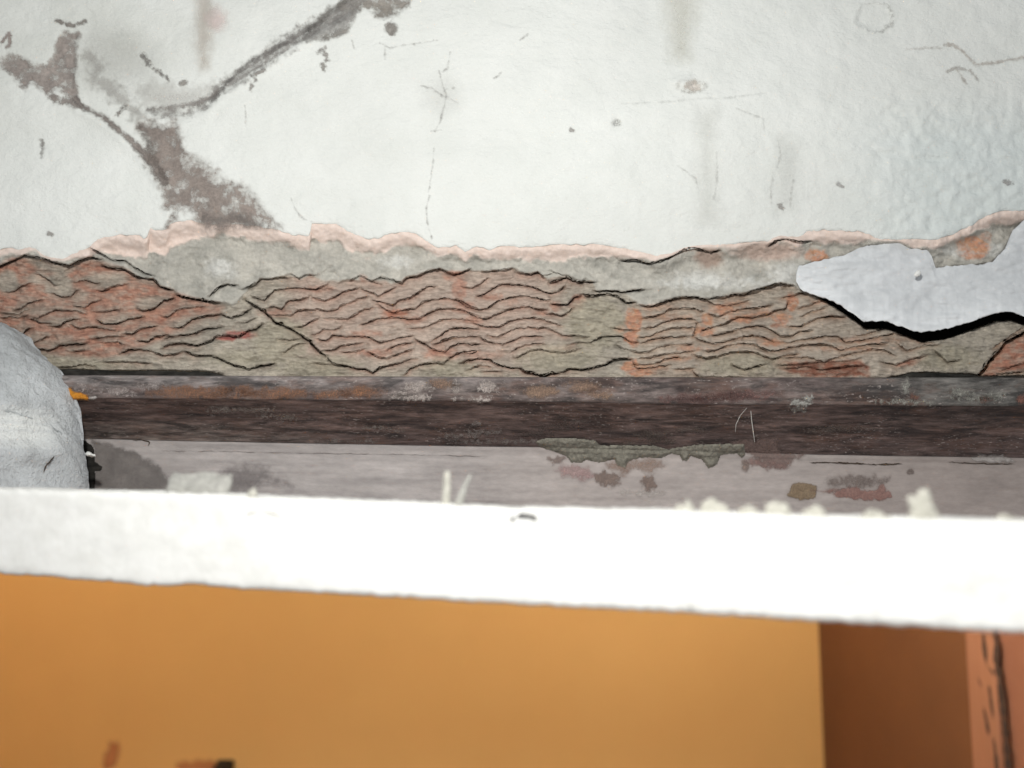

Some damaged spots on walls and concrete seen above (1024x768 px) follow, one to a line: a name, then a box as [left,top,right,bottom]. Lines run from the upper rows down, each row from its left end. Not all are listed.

spalling [0,211,1024,377]
damp [742,459,787,471]